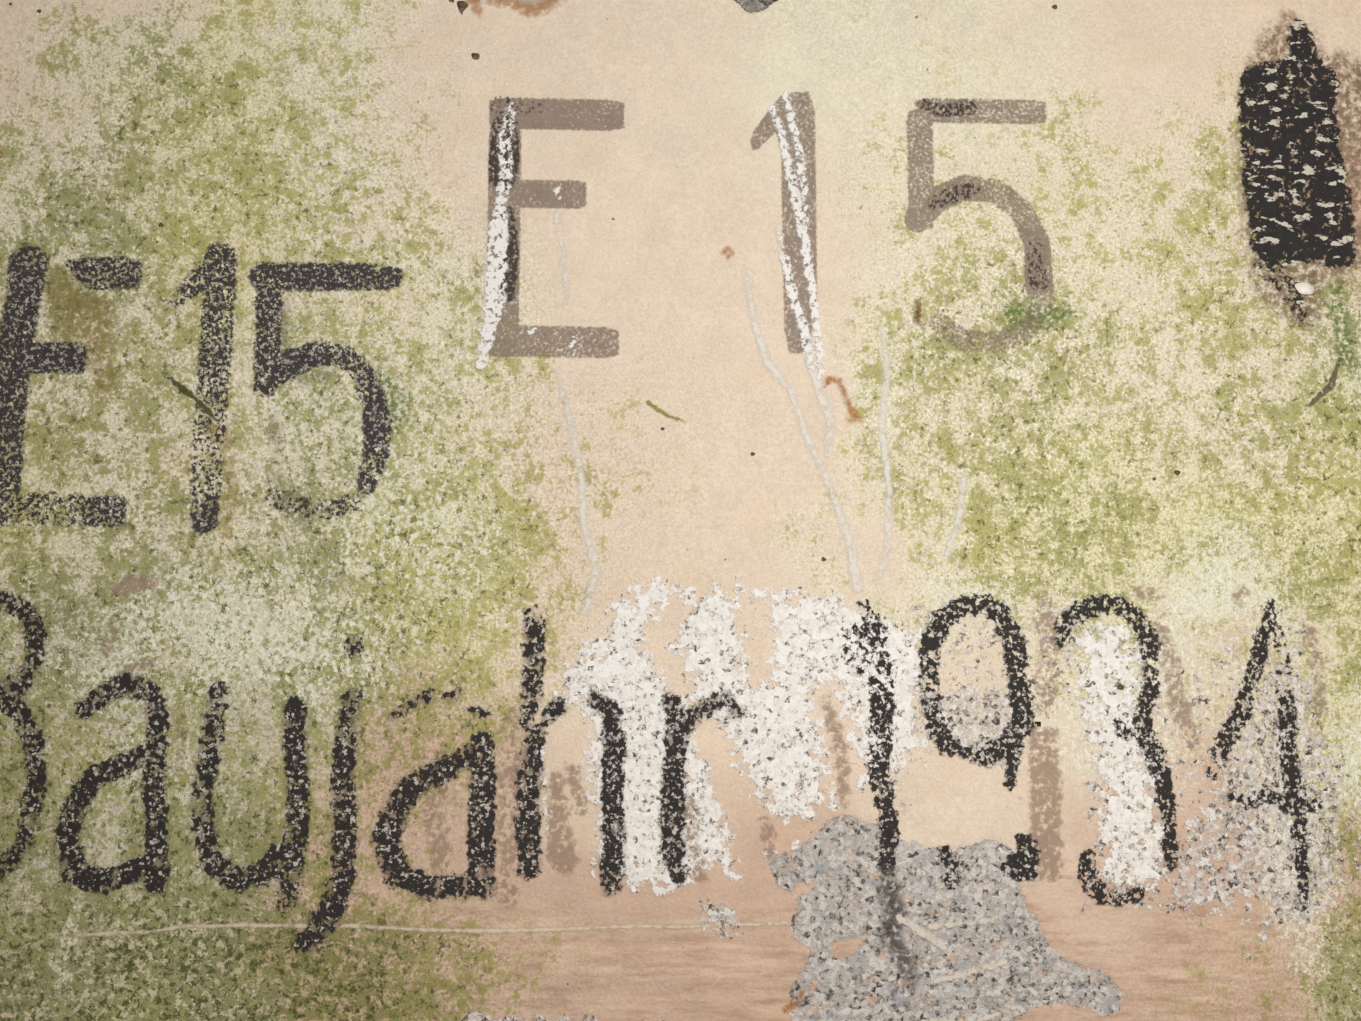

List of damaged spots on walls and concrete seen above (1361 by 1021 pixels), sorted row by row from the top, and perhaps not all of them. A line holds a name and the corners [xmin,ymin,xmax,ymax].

peeling [449,0,557,15]
spalling [734,0,778,13]
damp [744,274,893,593]
damp [556,367,600,615]
damp [945,472,967,558]
peeling [534,571,1361,1021]
peeling [455,1010,597,1021]